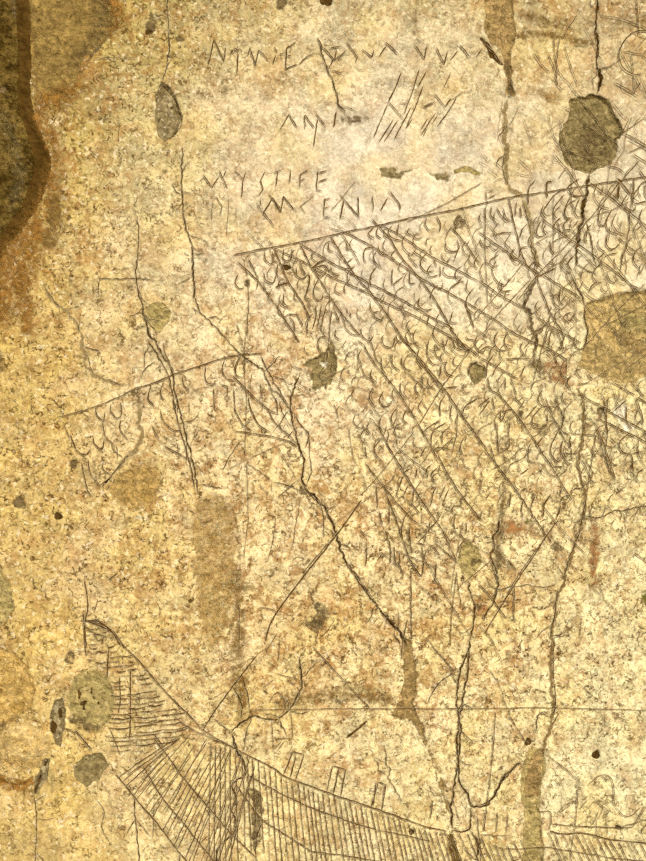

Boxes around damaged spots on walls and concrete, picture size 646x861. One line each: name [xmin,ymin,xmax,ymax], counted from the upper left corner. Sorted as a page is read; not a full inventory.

spalling [155,82,182,141]
spalling [559,93,624,174]
crack [98,211,222,491]
spalling [304,341,337,391]
crack [172,0,646,861]
crack [99,798,154,861]